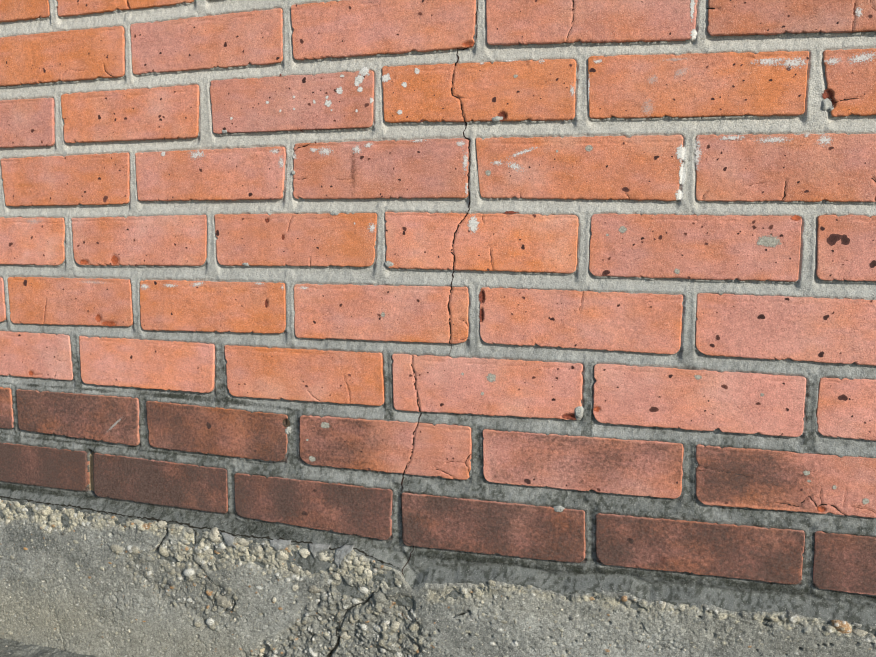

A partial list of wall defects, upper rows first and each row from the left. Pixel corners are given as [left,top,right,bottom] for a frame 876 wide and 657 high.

crack [448,3,484,354]
spalling [0,499,425,657]
crack [327,592,374,657]
leakage [0,384,876,602]